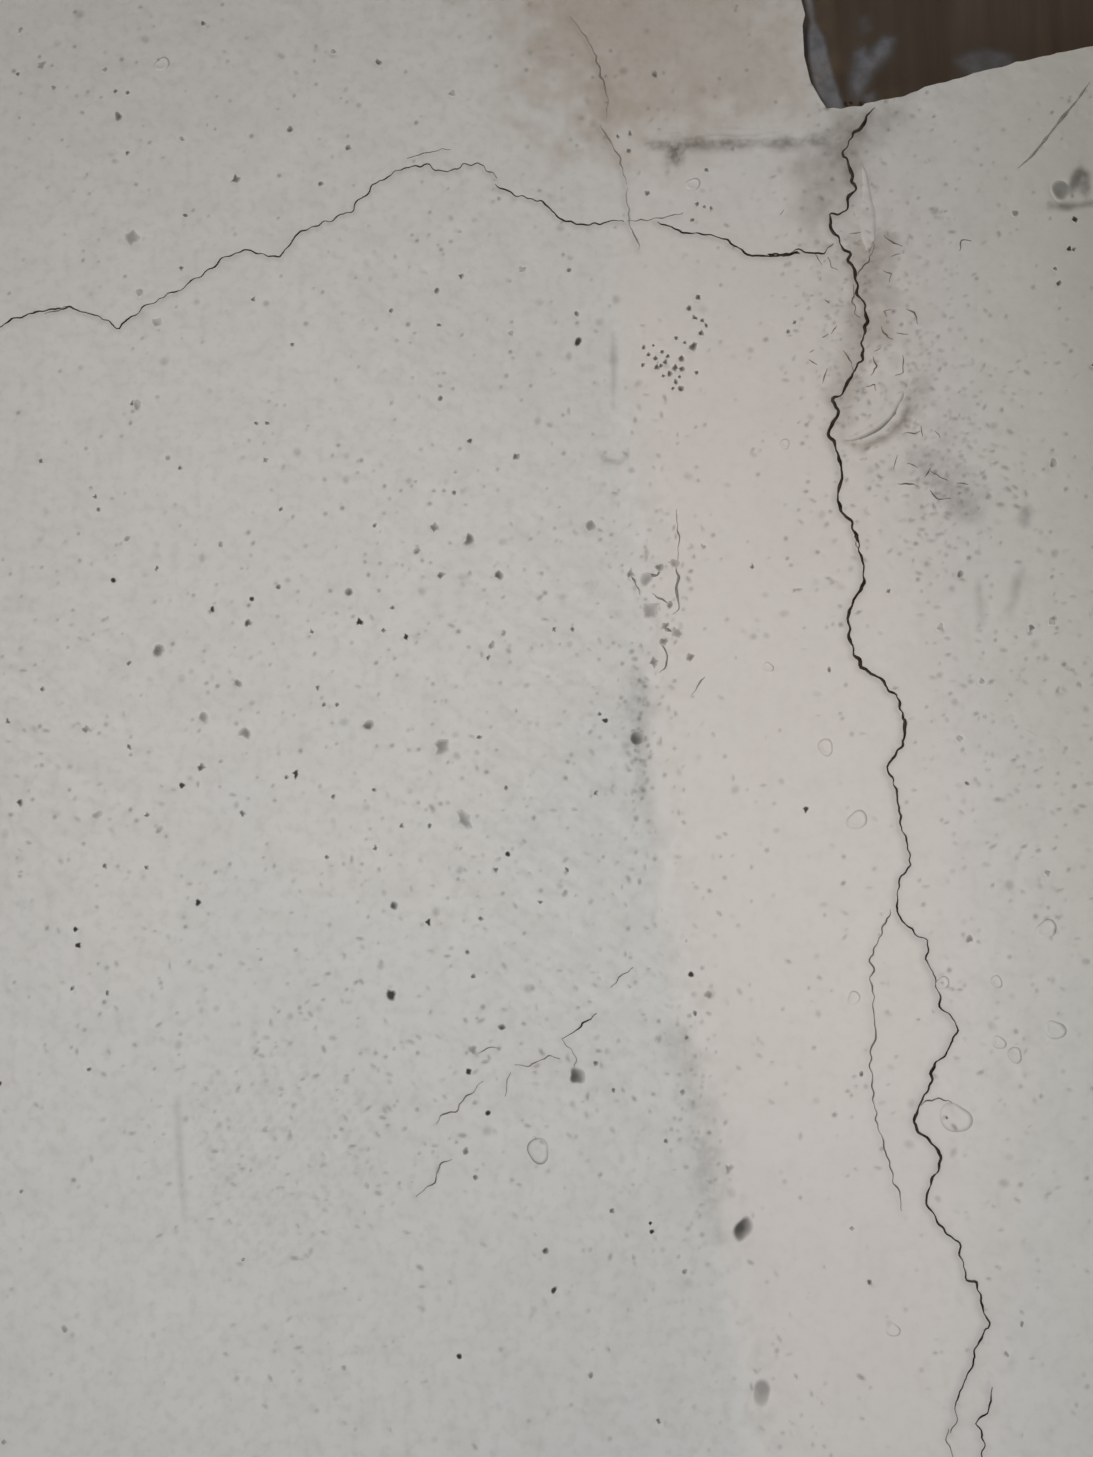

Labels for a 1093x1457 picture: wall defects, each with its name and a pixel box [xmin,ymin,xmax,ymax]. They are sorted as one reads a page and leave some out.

crack [570,17,609,117]
crack [0,124,837,329]
crack [827,108,993,1457]
crack [437,968,632,1123]
crack [416,1159,452,1197]